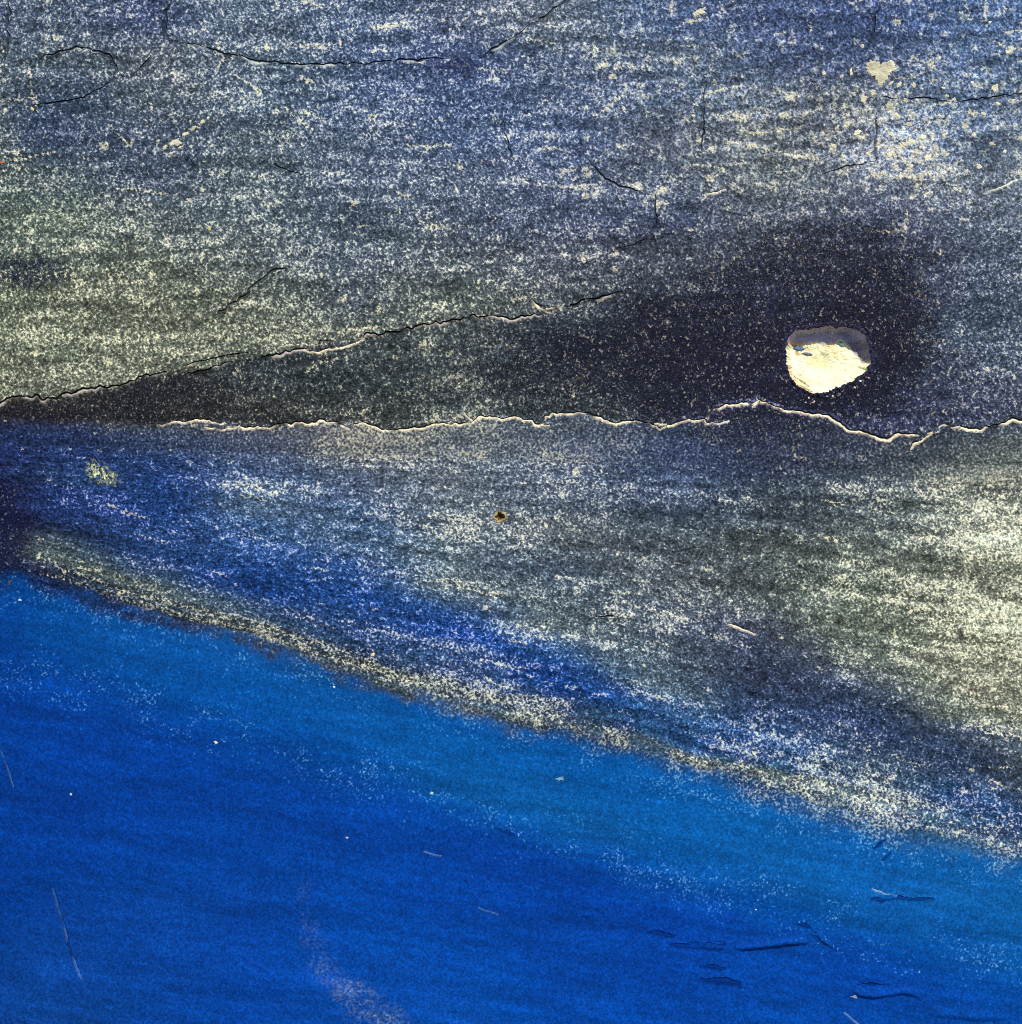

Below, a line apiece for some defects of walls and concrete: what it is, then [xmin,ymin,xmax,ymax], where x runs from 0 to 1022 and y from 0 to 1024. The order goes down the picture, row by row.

crack [31,0,451,109]
crack [0,154,670,408]
spalling [780,320,877,403]
crack [155,395,1022,451]